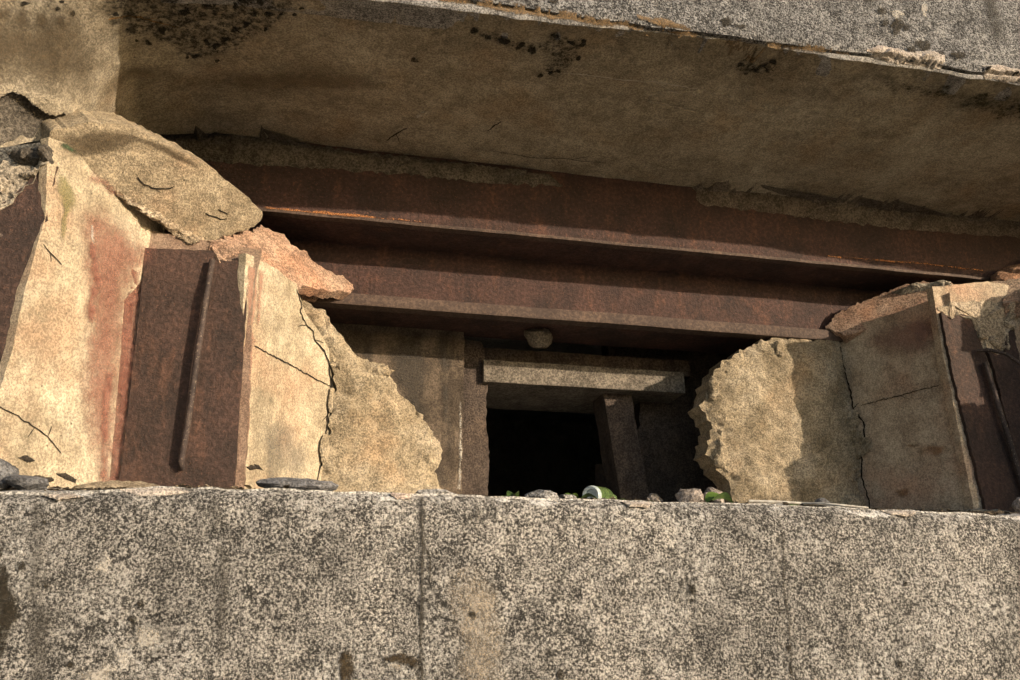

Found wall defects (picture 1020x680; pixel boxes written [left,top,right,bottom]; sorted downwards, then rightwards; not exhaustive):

water stain [105,0,304,64]
water stain [470,27,587,78]
spalling [866,45,945,70]
spalling [982,64,1020,83]
spalling [0,91,66,210]
spalling [159,125,563,188]
corrosion [266,207,421,222]
spalling [692,180,1020,239]
spalling [116,190,354,303]
spalling [890,280,953,295]
peeling [937,299,1017,354]
crack [255,290,332,434]